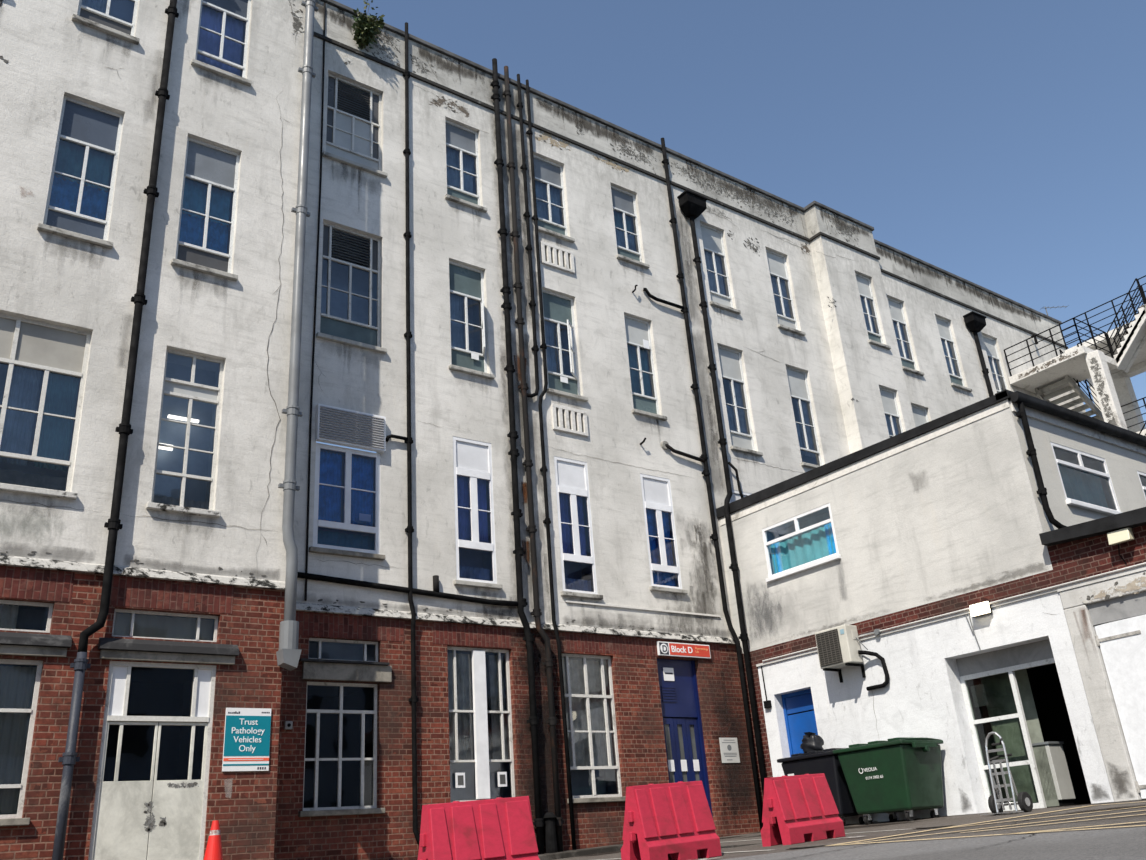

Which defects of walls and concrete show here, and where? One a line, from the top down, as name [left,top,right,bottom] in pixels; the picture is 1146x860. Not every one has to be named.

flaking render [289,0,304,34]
flaking render [429,95,469,118]
damp [538,100,652,153]
crack [127,97,290,559]
flaking render [1081,572,1146,603]